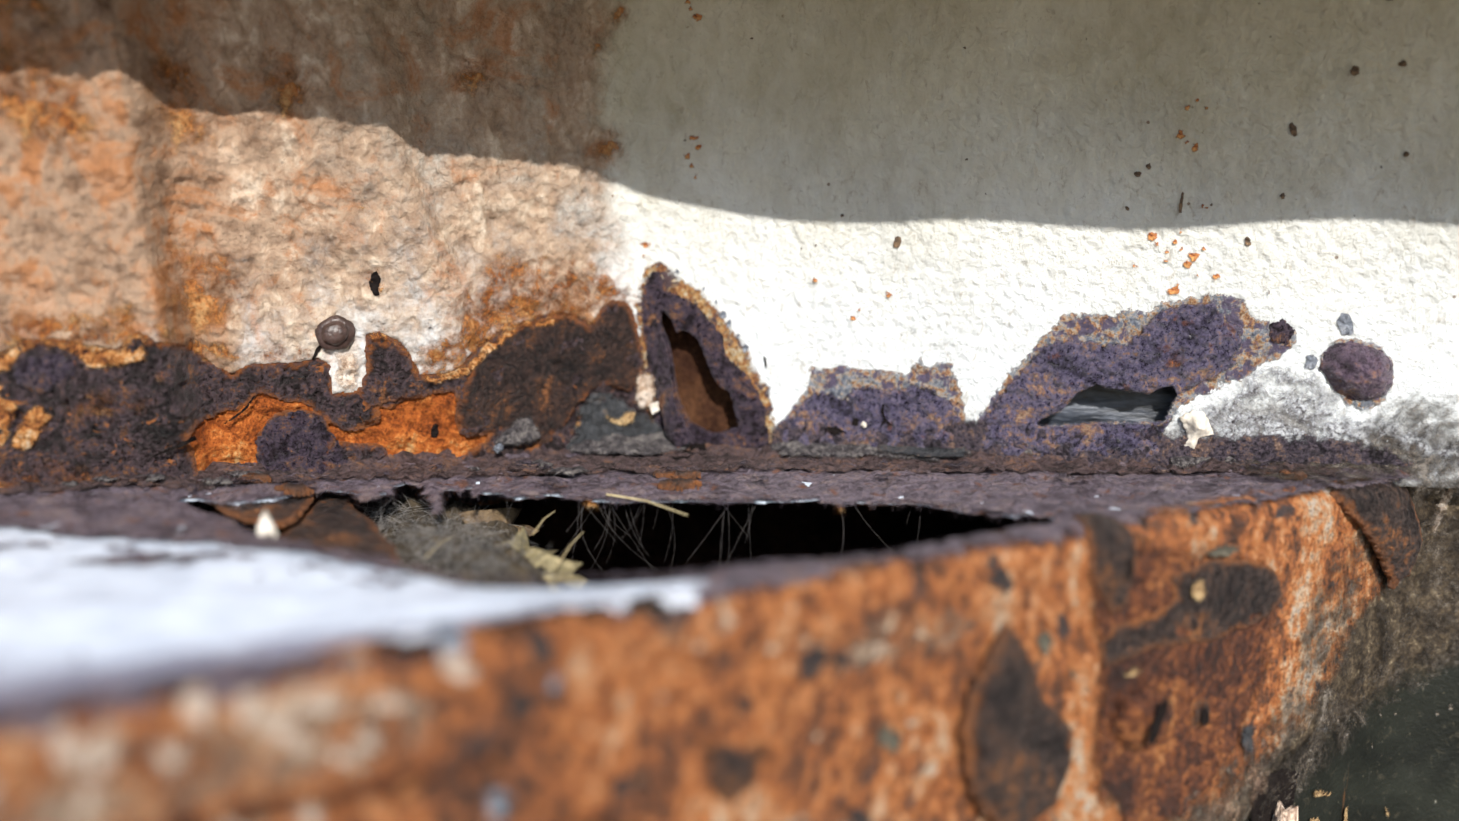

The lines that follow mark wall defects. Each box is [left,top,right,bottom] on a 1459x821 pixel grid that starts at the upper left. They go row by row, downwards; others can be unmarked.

corrosion [0,48,95,144]
peeling [256,509,277,538]
corrosion [0,231,1423,821]